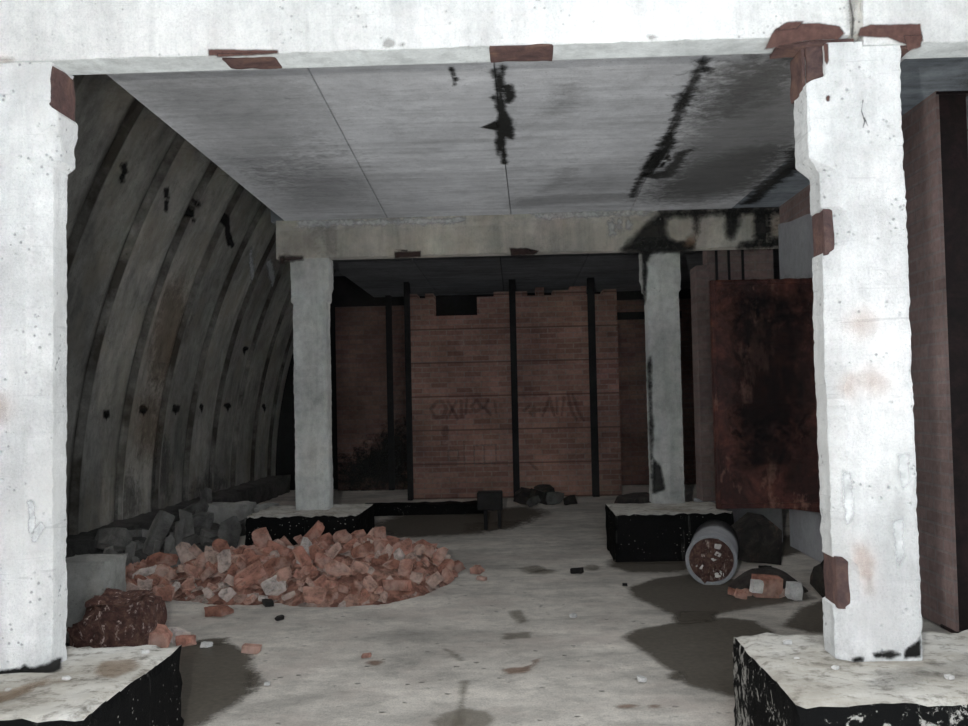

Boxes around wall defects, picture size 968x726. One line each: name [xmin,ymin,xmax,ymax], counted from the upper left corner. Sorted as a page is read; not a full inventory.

crack [847,1,855,38]
damp [483,65,516,164]
damp [630,59,711,197]